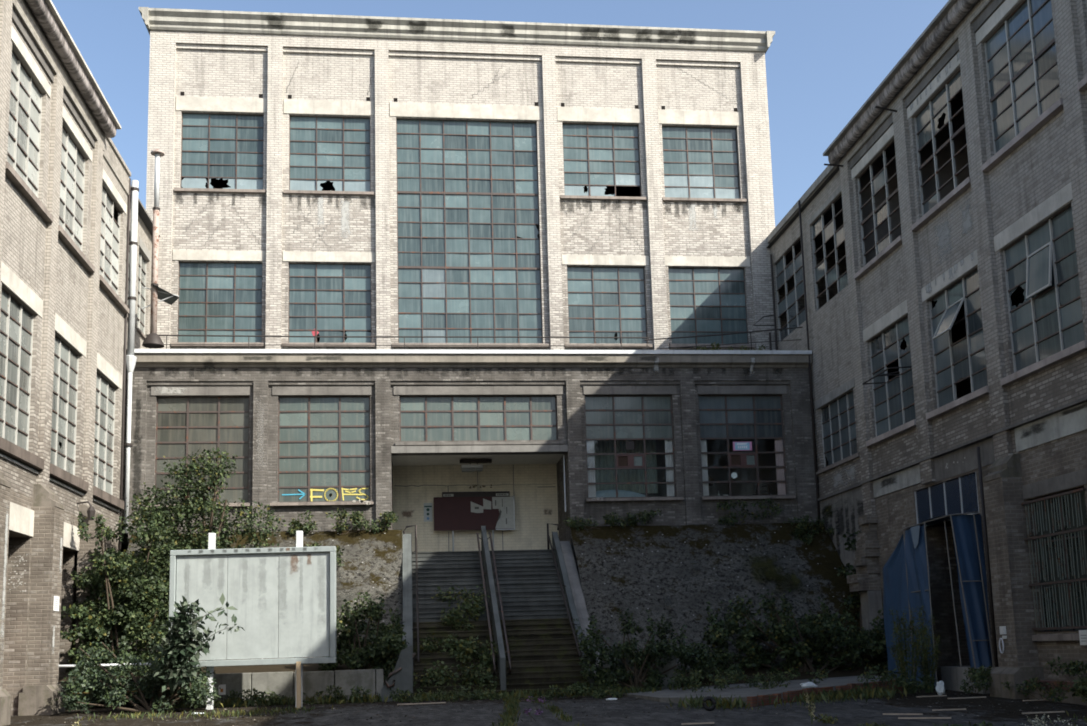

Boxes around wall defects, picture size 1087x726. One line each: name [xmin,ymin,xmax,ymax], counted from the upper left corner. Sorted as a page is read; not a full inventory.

water stain [268,16,282,28]
water stain [409,22,425,33]
water stain [581,28,619,40]
water stain [636,30,695,44]
water stain [341,200,350,237]